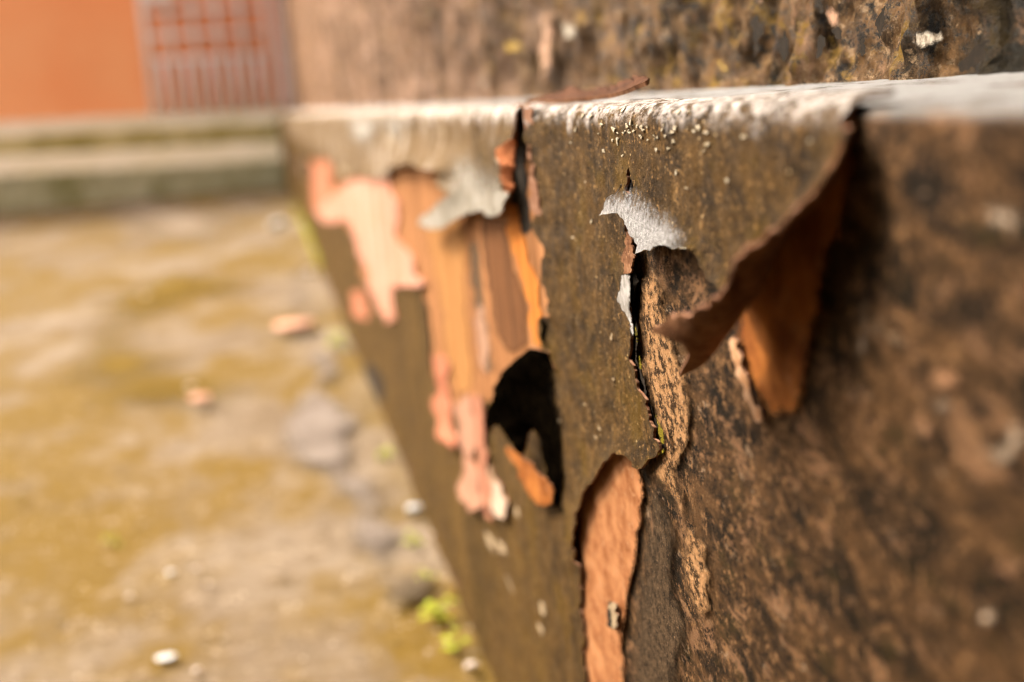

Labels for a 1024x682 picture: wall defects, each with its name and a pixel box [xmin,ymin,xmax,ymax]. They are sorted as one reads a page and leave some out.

peeling [310,145,549,554]
crack [495,107,542,235]
peeling [569,106,710,157]
peeling [590,184,693,254]
crack [617,231,666,455]
peeling [641,123,856,509]
peeling [573,453,643,682]
flaking render [684,530,709,613]